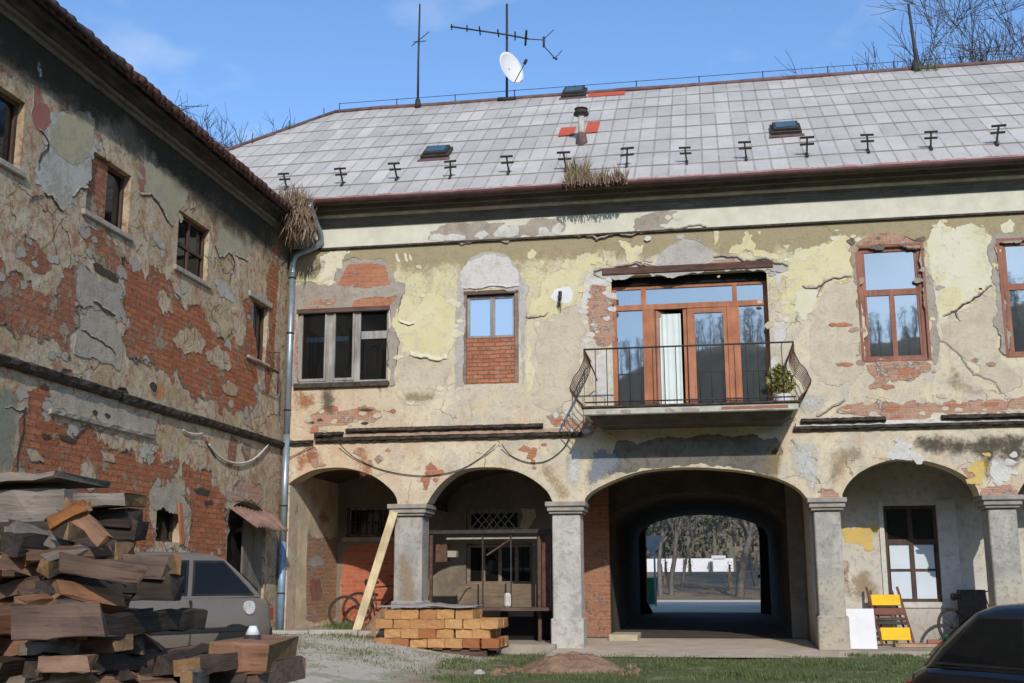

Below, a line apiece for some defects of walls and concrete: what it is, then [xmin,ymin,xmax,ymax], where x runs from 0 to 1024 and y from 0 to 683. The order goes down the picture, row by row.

peeling [31,82,101,210]
flaking render [0,216,282,426]
crack [140,192,173,226]
peeling [136,151,189,226]
spalling [292,249,466,387]
peeling [428,218,566,259]
peeling [457,209,1024,438]
crack [714,254,852,298]
crack [940,284,1002,392]
flaking render [12,383,263,560]
flaking render [303,398,415,469]
leakage [917,435,1024,463]